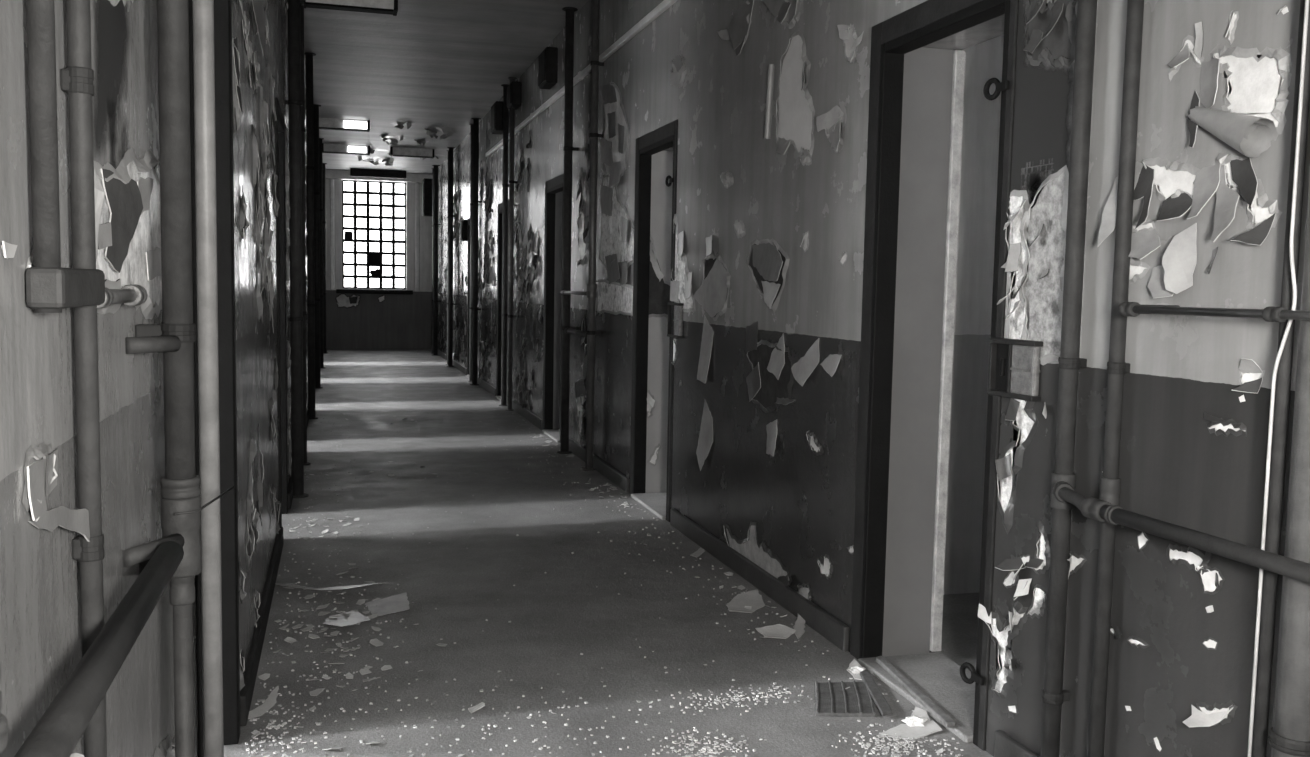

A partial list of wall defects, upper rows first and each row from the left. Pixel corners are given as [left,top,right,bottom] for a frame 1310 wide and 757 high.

peeling [717,0,844,166]
peeling [997,165,1069,365]
peeling [1097,177,1118,247]
peeling [1128,10,1292,299]
peeling [647,214,731,471]
peeling [745,321,842,457]
peeling [995,398,1047,534]
peeling [977,521,1050,699]
peeling [1137,532,1150,551]
peeling [1166,544,1225,613]
peeling [1203,637,1218,650]
peeling [1183,700,1238,728]